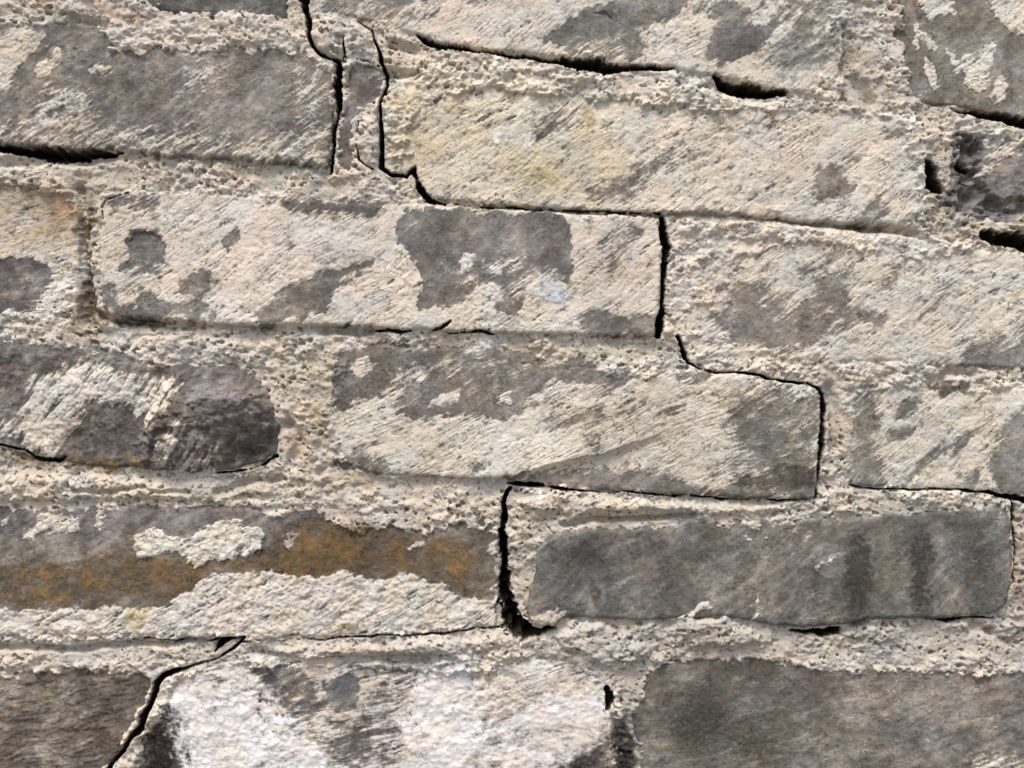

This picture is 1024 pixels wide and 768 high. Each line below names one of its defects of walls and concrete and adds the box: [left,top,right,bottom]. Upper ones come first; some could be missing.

crack [951,109,1024,129]
crack [0,145,125,164]
crack [925,159,968,195]
crack [979,229,1024,253]
crack [107,0,826,768]